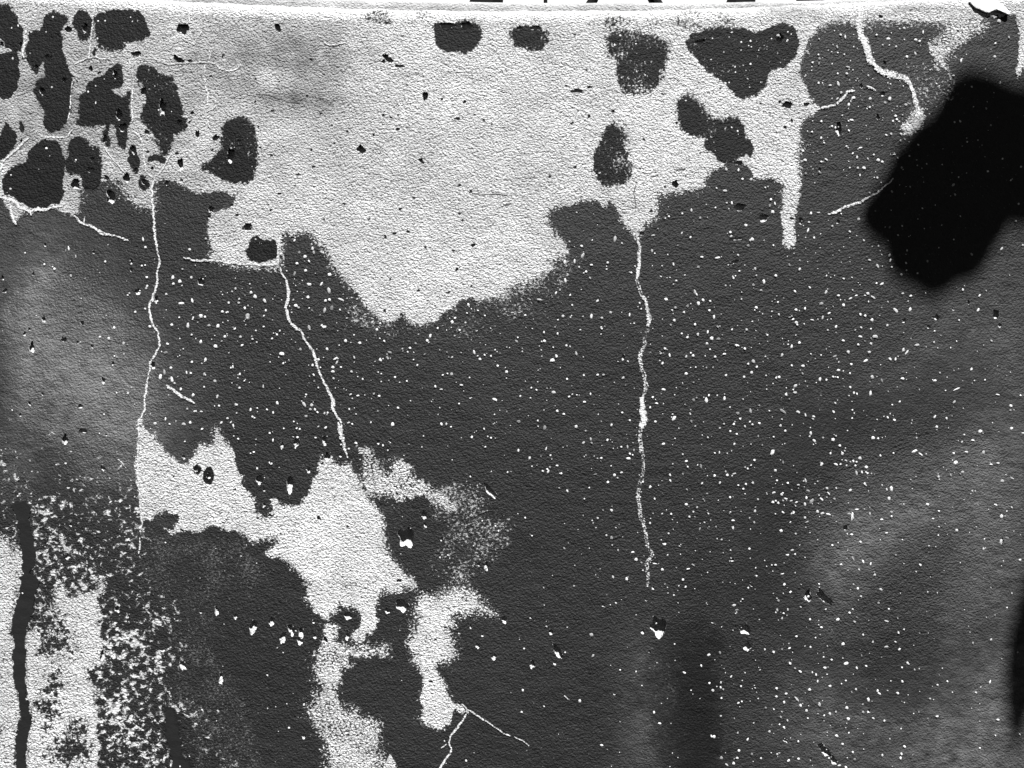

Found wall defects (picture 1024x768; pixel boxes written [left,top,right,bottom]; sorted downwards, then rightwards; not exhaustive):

water stain [0,3,188,209]
water stain [201,116,260,184]
water stain [591,121,635,188]
water stain [604,15,672,98]
water stain [674,90,754,163]
water stain [675,10,800,100]
crack [818,3,924,131]
crack [0,2,348,554]
crack [635,234,654,587]
crack [439,704,529,768]